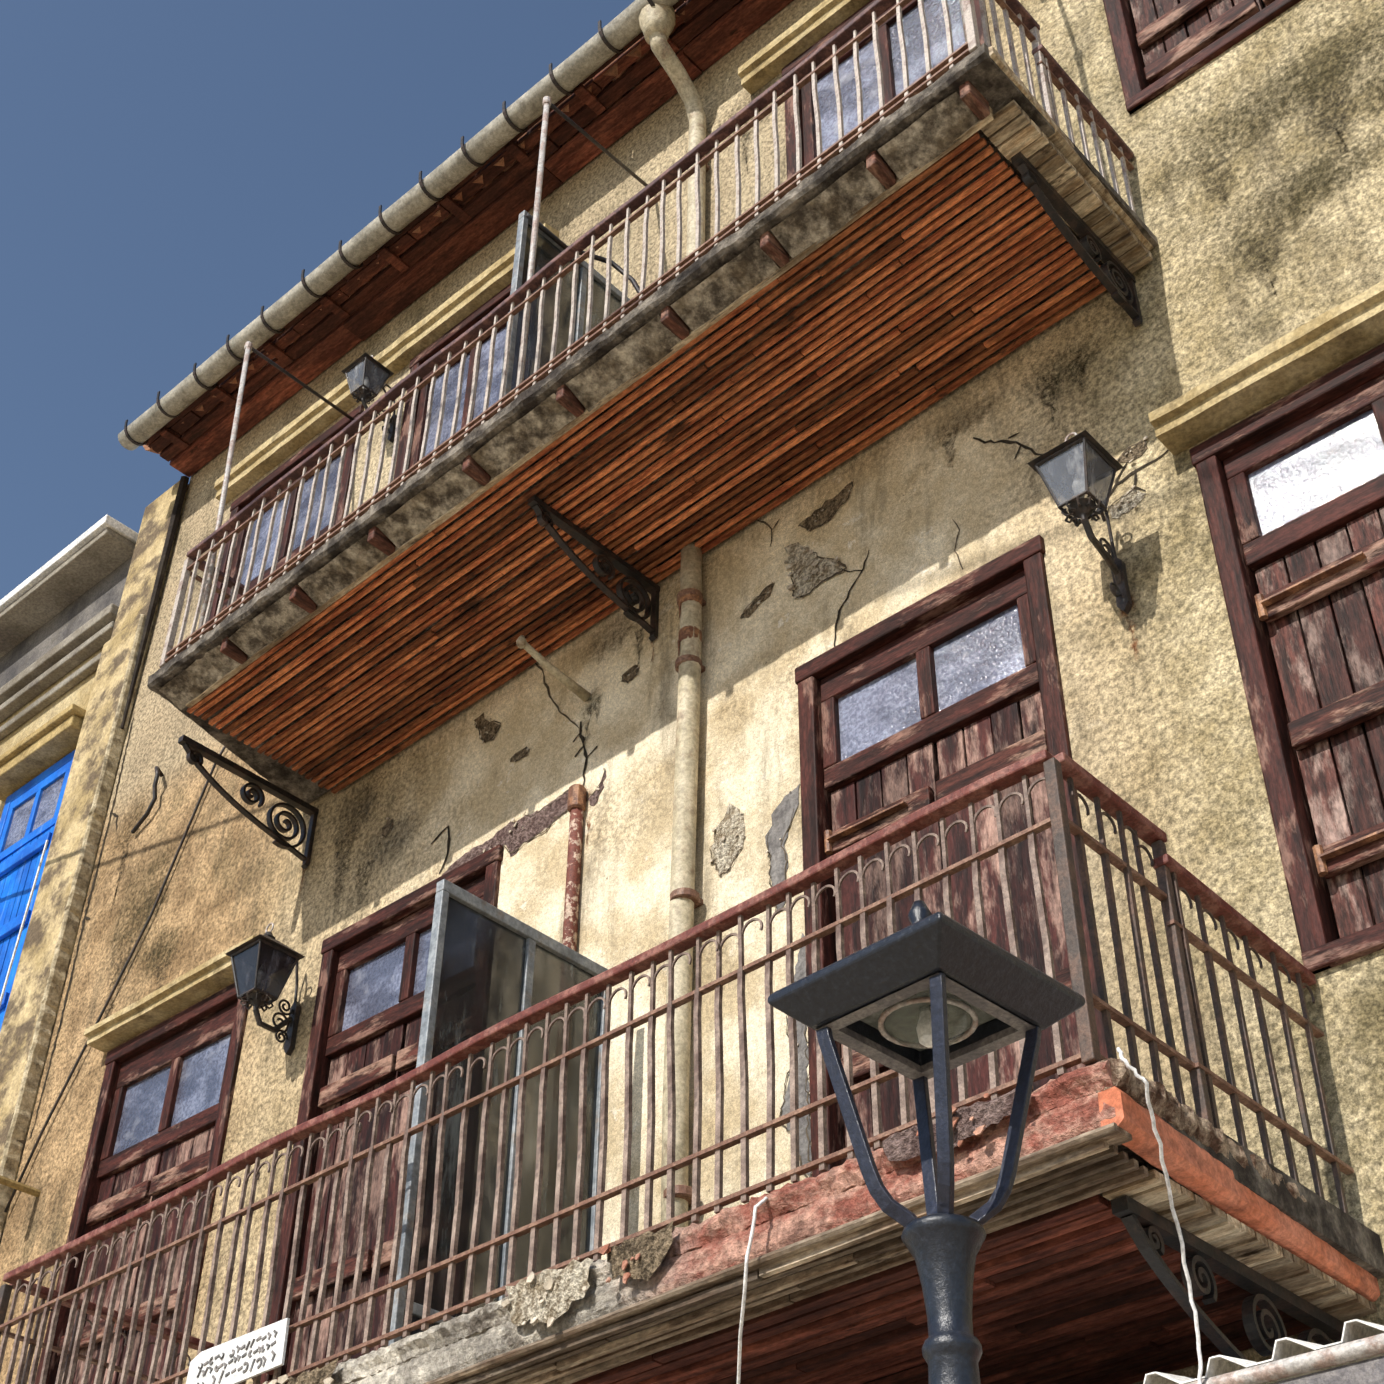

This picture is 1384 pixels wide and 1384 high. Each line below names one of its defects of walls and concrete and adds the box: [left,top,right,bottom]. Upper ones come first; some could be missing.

crack [973,432,1042,459]
spalling [740,479,854,619]
crack [834,550,869,647]
spalling [474,712,501,743]
crack [535,663,598,786]
peeling [587,768,606,806]
peeling [442,789,569,875]
spalling [709,803,745,875]
peeling [765,784,800,887]
spalling [882,1088,1031,1161]
spalling [502,1221,673,1328]